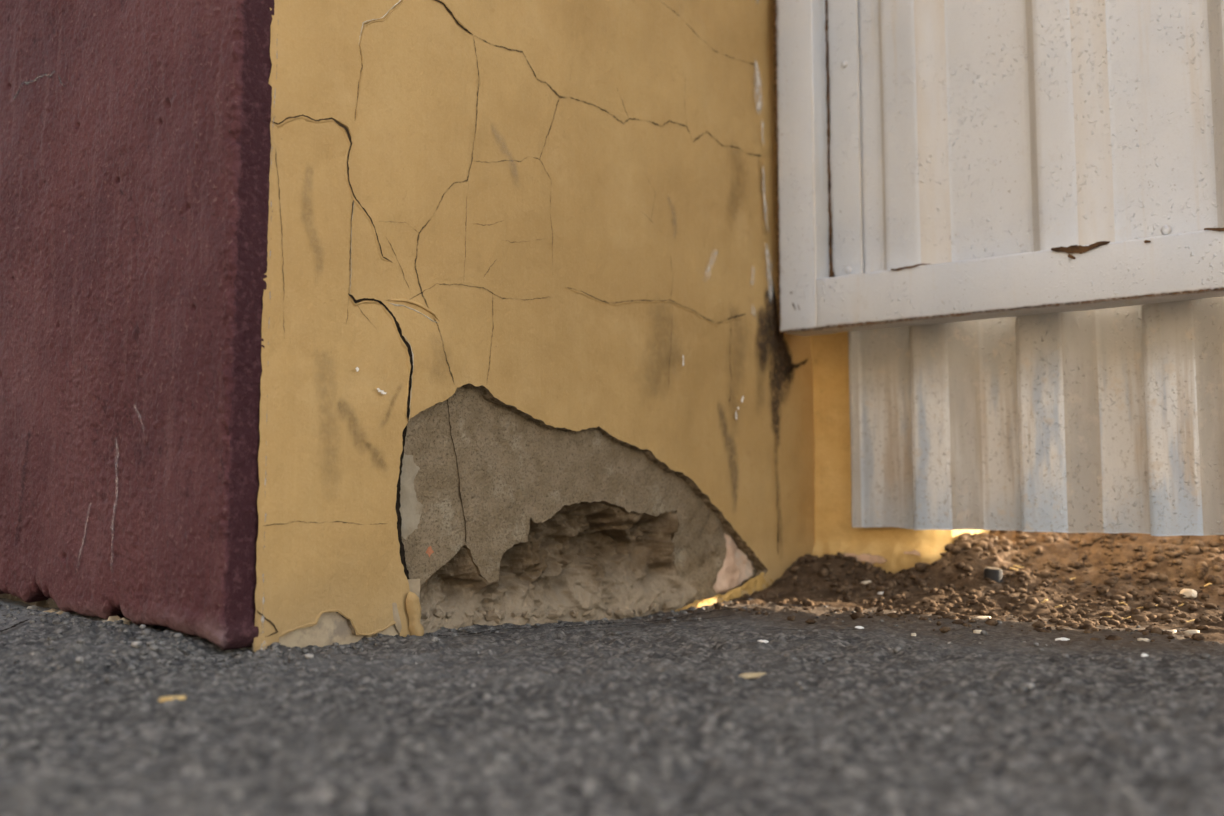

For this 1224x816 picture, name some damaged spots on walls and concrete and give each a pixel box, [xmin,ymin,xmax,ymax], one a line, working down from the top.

crack [271,0,761,579]
corrosion [1051,241,1110,259]
peeling [279,609,401,648]
flaking render [395,383,773,634]